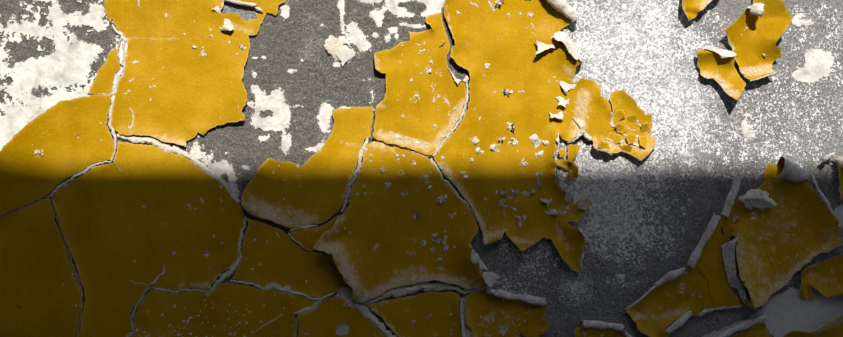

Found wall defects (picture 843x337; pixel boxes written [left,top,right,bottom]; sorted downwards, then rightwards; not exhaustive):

flaking render [0,0,128,151]
crack [0,24,484,337]
flaking render [183,0,445,204]
flaking render [470,0,843,337]
peeling [460,297,472,337]